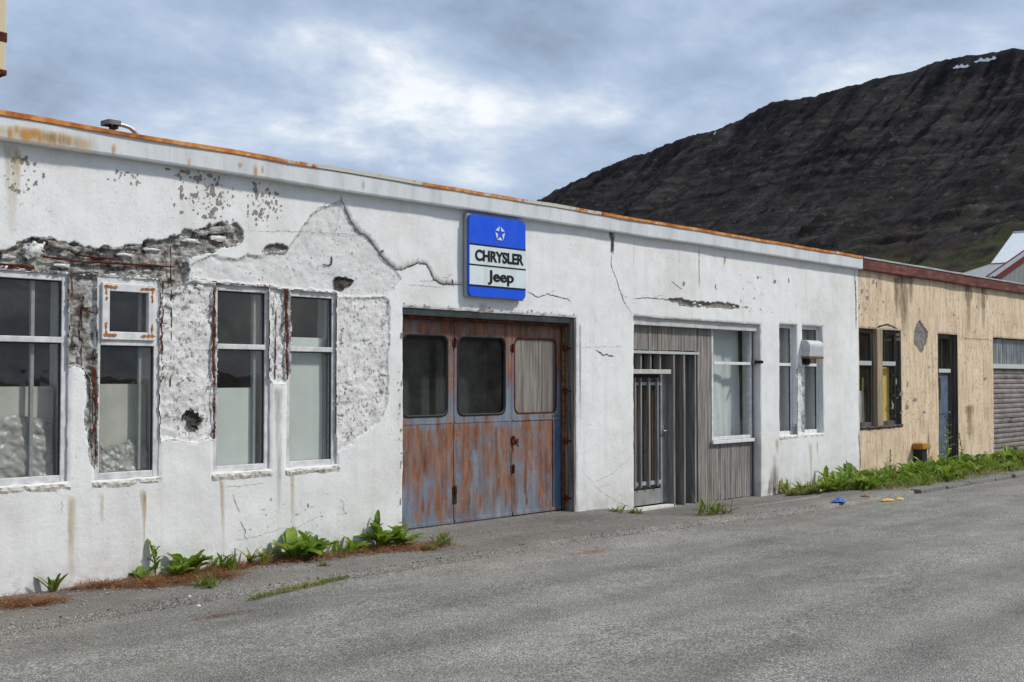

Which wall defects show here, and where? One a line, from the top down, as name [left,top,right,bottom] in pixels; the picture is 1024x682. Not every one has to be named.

corrosion [9,127,85,146]
peeling [4,155,45,194]
crack [253,192,464,287]
crack [611,255,700,312]
spalling [665,276,790,310]
damp [895,276,912,313]
spalling [0,168,403,468]
spalling [913,322,928,353]
corrosion [211,283,269,439]